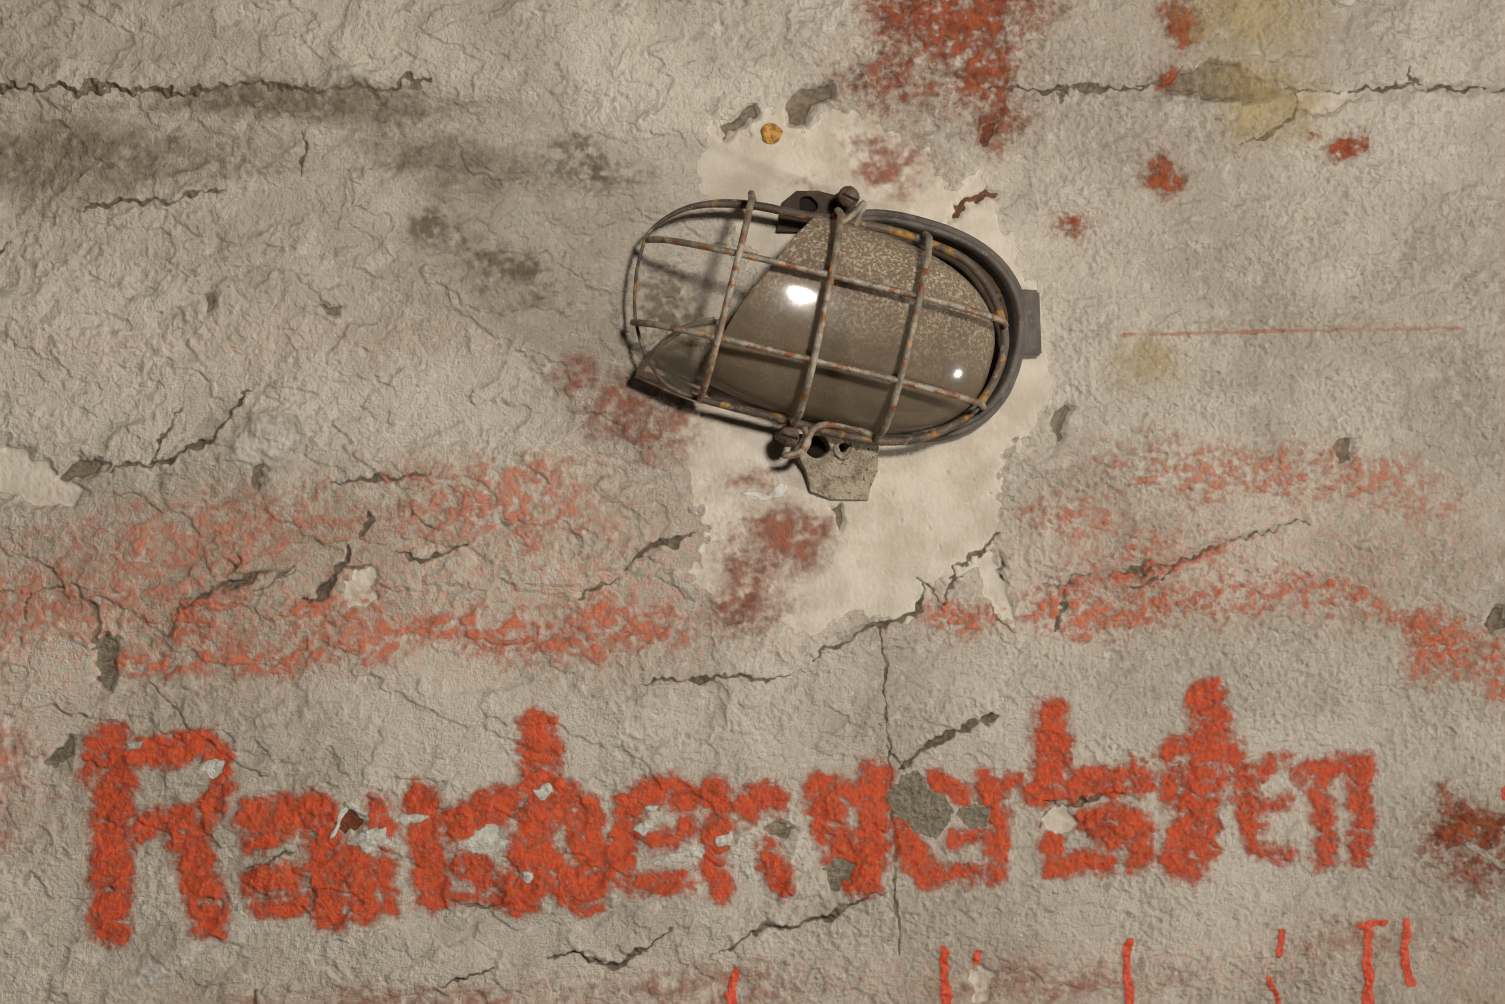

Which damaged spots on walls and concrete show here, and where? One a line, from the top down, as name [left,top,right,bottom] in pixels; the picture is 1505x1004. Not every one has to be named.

crack [0,72,432,99]
spalling [721,106,758,140]
spalling [786,84,832,126]
spalling [979,123,995,147]
crack [1239,67,1503,145]
spalling [952,189,998,219]
crack [110,390,250,473]
spalling [832,505,842,529]
crack [166,472,468,639]
spalling [978,551,1016,625]
crack [641,532,1012,956]
crack [547,927,672,971]